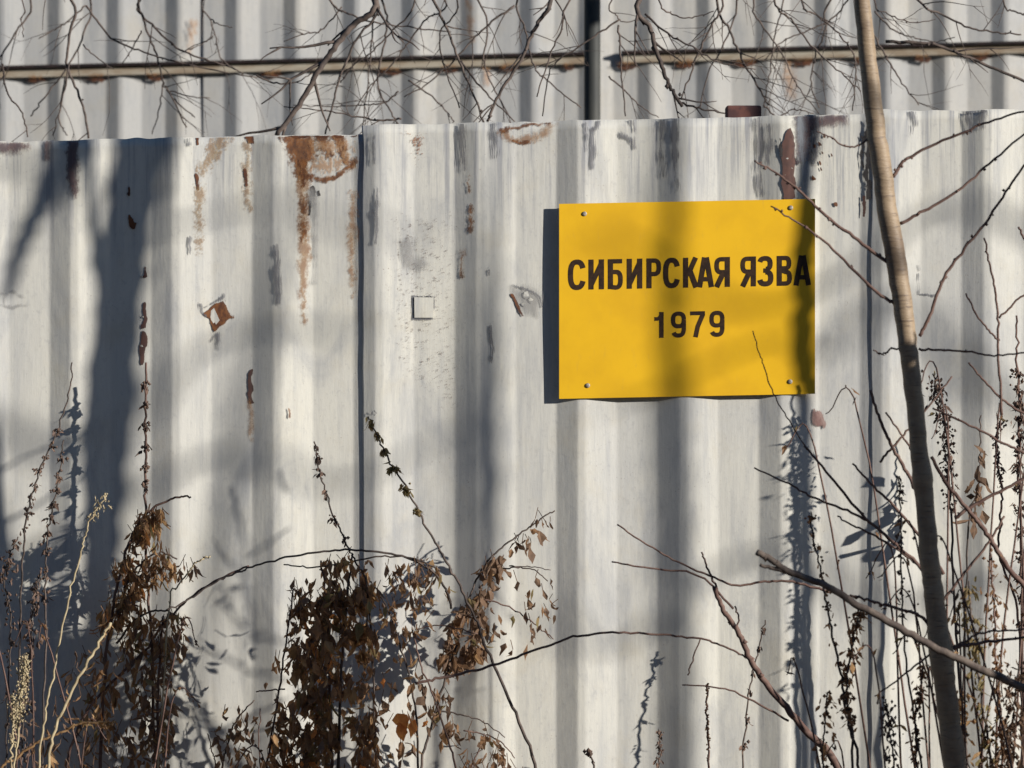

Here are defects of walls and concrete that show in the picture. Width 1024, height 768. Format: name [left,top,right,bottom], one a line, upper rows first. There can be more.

rust [497,122,551,144]
rust [195,137,229,249]
rust [279,135,358,323]